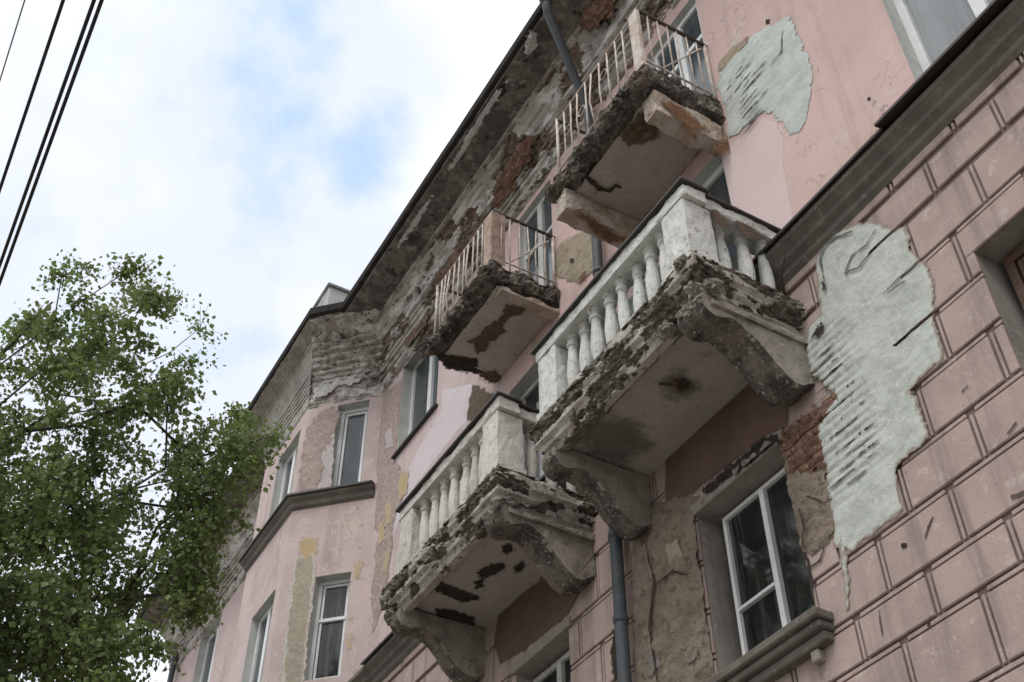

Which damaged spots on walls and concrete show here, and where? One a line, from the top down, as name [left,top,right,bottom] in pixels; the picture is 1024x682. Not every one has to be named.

flaking render [431,134,536,292]
spalling [555,232,593,284]
spalling [544,58,647,204]
crack [579,169,621,193]
peeling [716,15,813,138]
peeling [298,372,365,492]
spalling [477,371,501,385]
spalling [467,304,526,352]
peeling [630,220,943,682]
flaking render [281,536,319,682]
spalling [435,544,524,626]
flaking render [494,580,579,664]